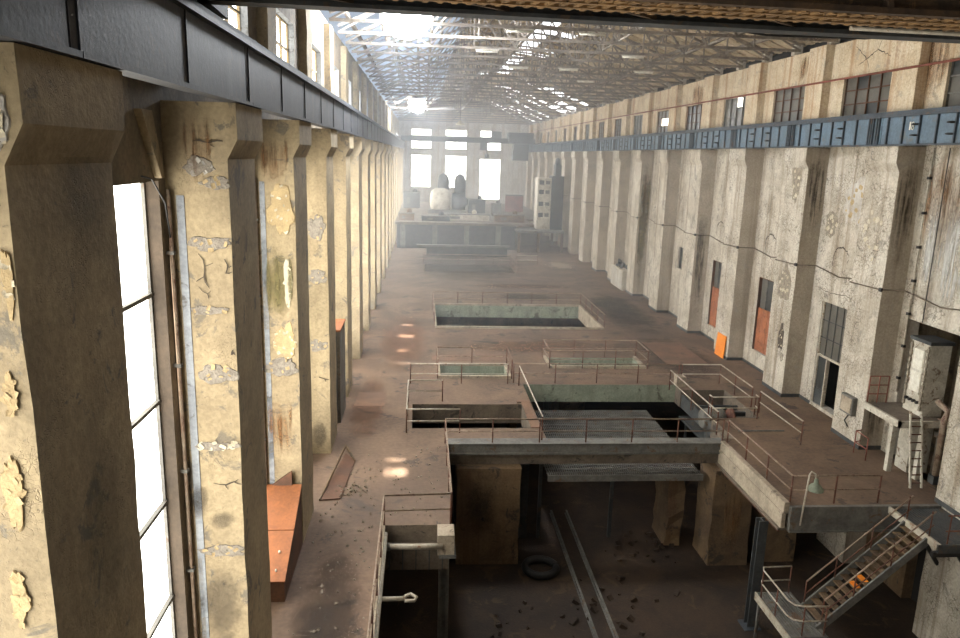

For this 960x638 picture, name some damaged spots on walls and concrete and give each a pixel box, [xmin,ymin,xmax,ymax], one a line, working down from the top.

peeling [182,155,231,190]
spalling [187,236,231,252]
peeling [266,183,296,235]
spalling [307,214,326,241]
crack [196,253,232,298]
damp [266,258,293,308]
peeling [0,371,19,417]
spalling [198,364,240,385]
spalling [195,441,242,451]
peeling [0,455,27,532]
peeling [8,570,32,629]